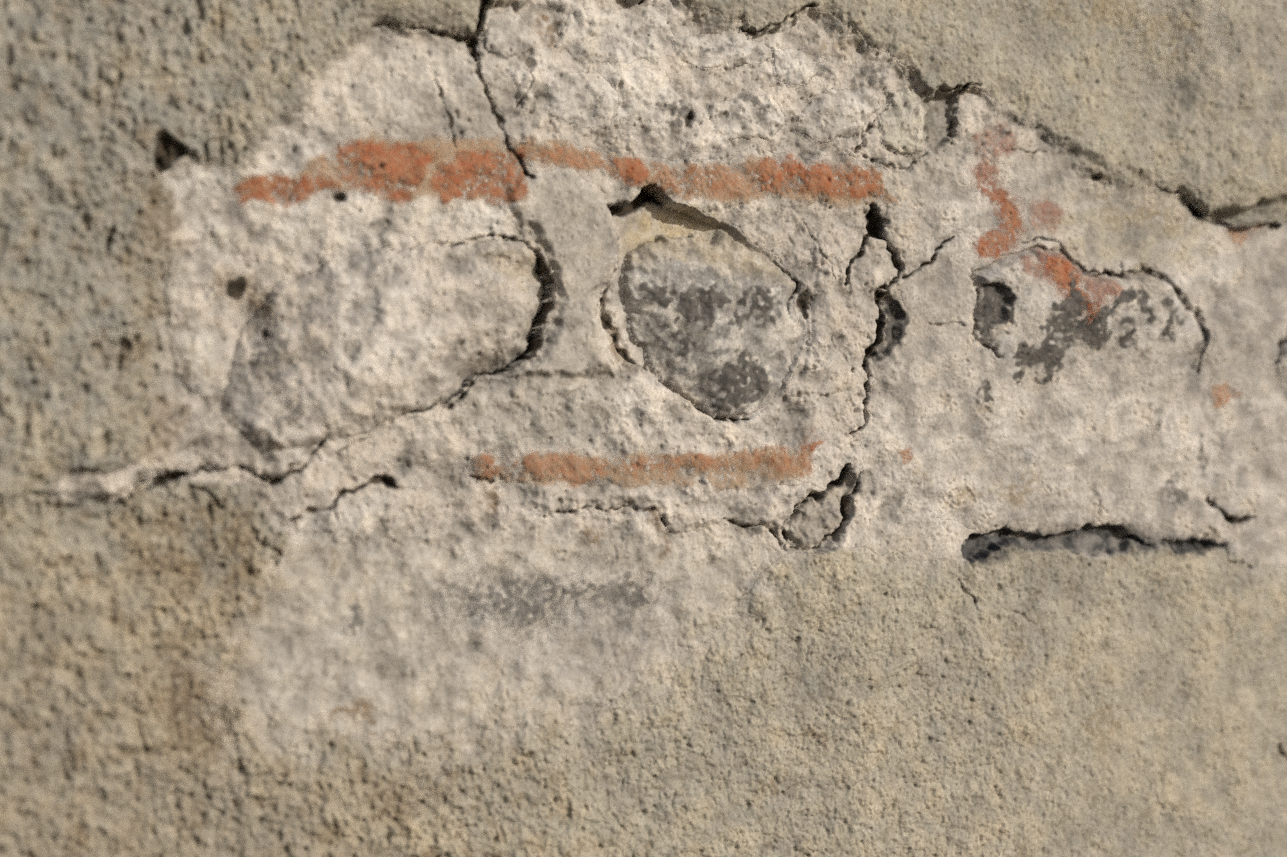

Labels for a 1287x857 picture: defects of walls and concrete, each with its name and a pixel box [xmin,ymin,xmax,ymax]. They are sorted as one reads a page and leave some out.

crack [937,83,981,137]
spalling [369,132,453,148]
peeling [1034,202,1062,223]
crack [1171,192,1283,228]
peeling [1021,251,1123,320]
crack [238,440,348,484]
crack [153,468,225,509]
spalling [563,505,649,518]
crack [957,500,1251,605]
spalling [1001,526,1218,557]
spalling [225,554,280,746]